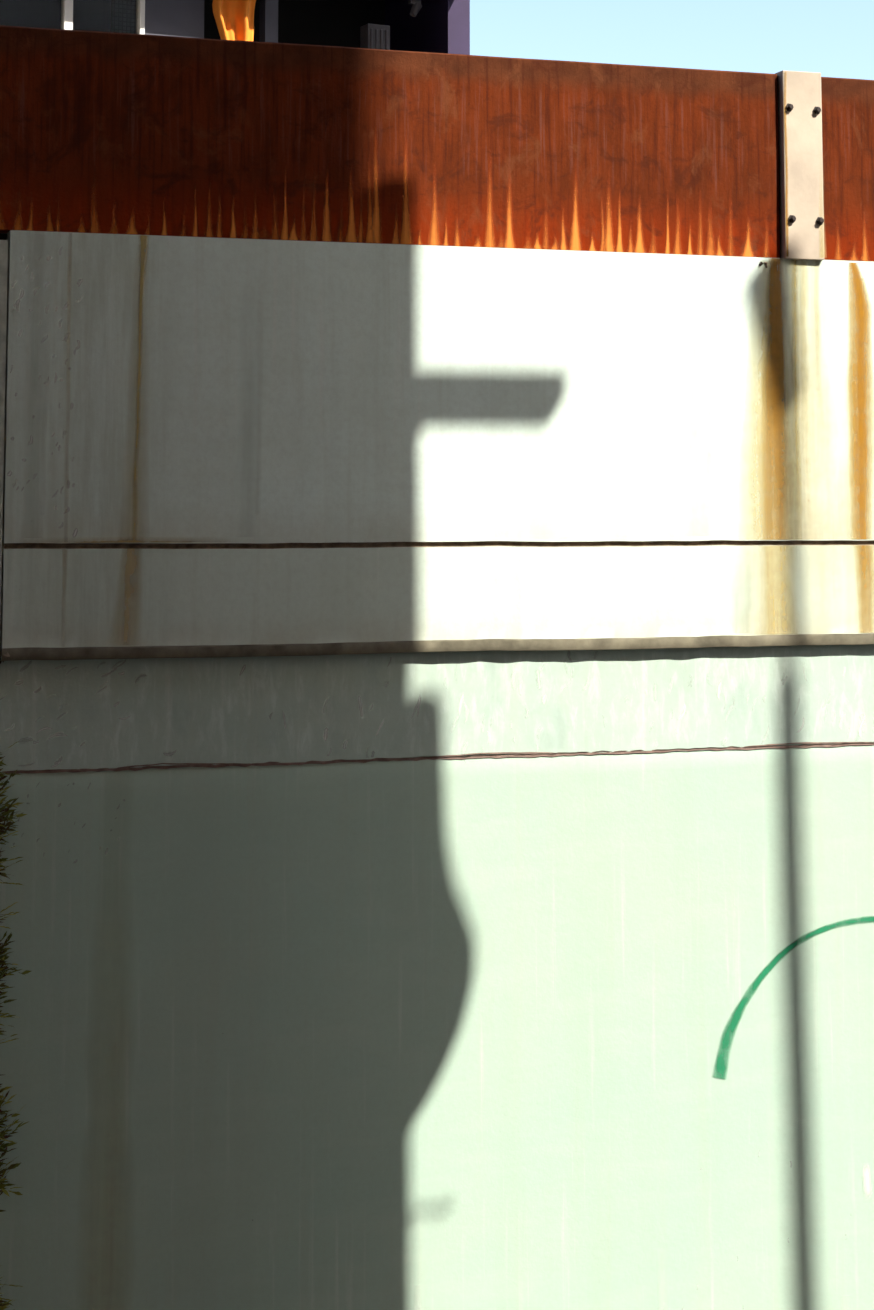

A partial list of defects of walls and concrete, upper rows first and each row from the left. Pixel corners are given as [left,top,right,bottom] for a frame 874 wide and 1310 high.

rust [77,72,798,551]